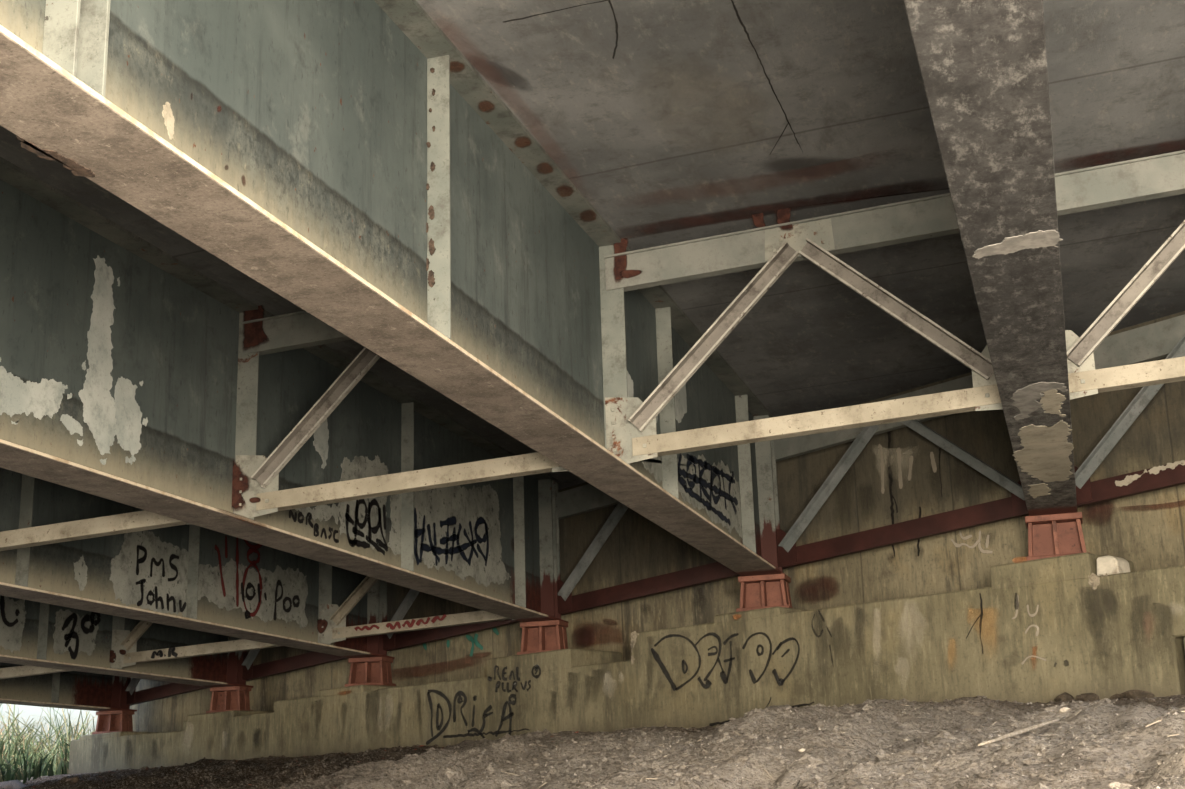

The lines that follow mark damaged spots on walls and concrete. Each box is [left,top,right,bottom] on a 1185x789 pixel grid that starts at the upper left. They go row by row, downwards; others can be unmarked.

crack [503,0,618,59]
crack [731,0,803,154]
corrosion [642,185,924,234]
corrosion [614,238,642,281]
peeling [972,230,1063,259]
corrosion [236,305,269,354]
peeling [0,255,148,465]
peeling [1010,382,1074,498]
peeling [1115,460,1185,487]